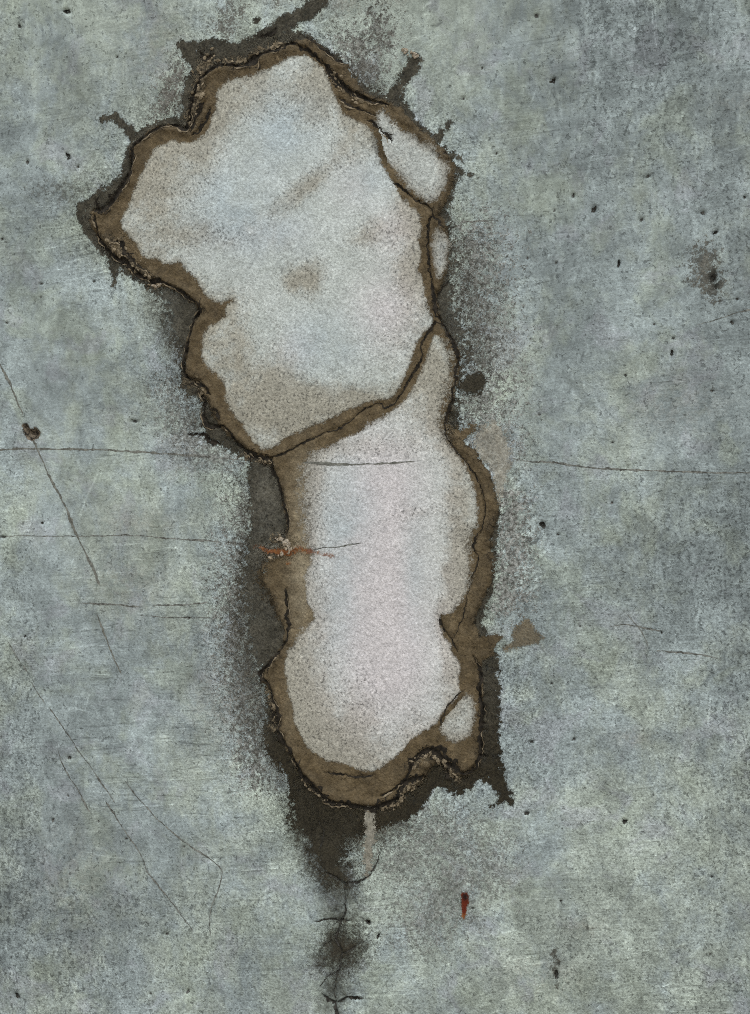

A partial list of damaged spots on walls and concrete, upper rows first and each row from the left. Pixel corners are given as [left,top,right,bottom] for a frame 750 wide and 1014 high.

spalling [183,40,286,127]
spalling [314,59,371,105]
spalling [102,234,162,292]
crack [0,26,497,1014]
spalling [265,532,295,562]
corrosion [259,547,334,564]
water stain [76,0,545,999]
spalling [381,750,461,814]
corrosion [461,892,469,919]